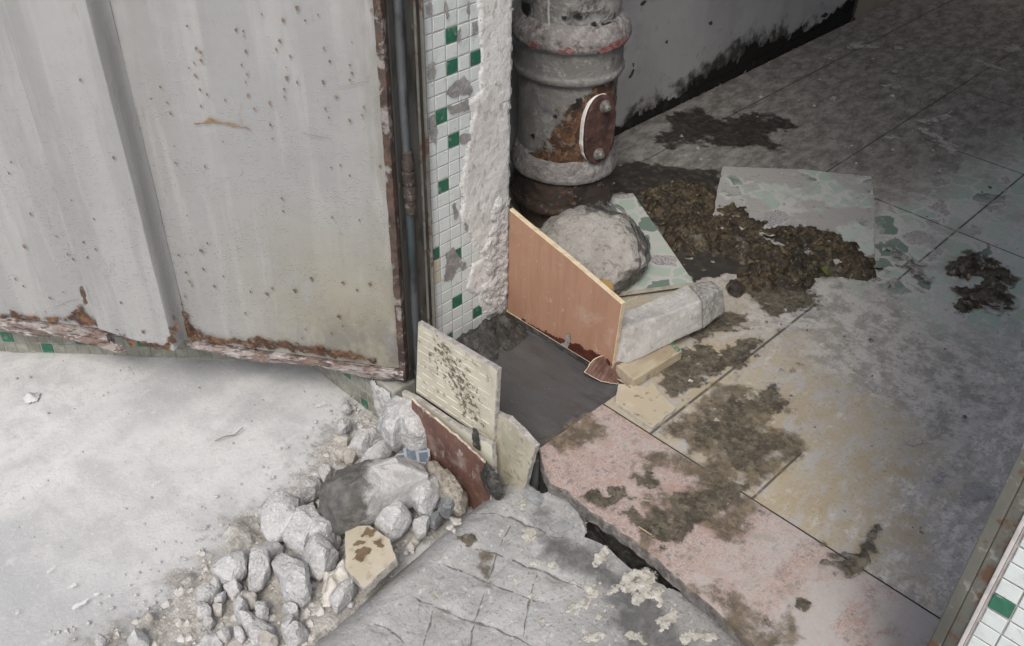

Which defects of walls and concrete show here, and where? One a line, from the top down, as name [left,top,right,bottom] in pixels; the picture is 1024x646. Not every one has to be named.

rust [188,47,250,130]
rust [529,81,617,163]
leakage [614,0,855,150]
spalling [479,195,511,319]
rust [0,271,377,364]